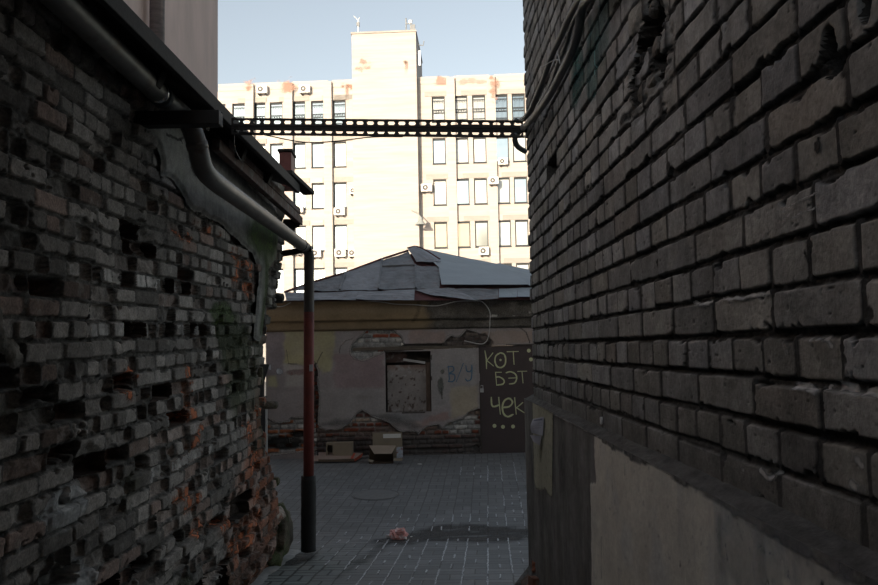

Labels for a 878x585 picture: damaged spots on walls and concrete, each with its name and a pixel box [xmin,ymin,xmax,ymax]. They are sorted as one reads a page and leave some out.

flaking render [350,330,405,362]
spalling [71,451,107,480]
spalling [150,366,204,449]
flaking render [241,397,303,475]
flaking render [314,408,481,457]
spalling [171,476,280,585]